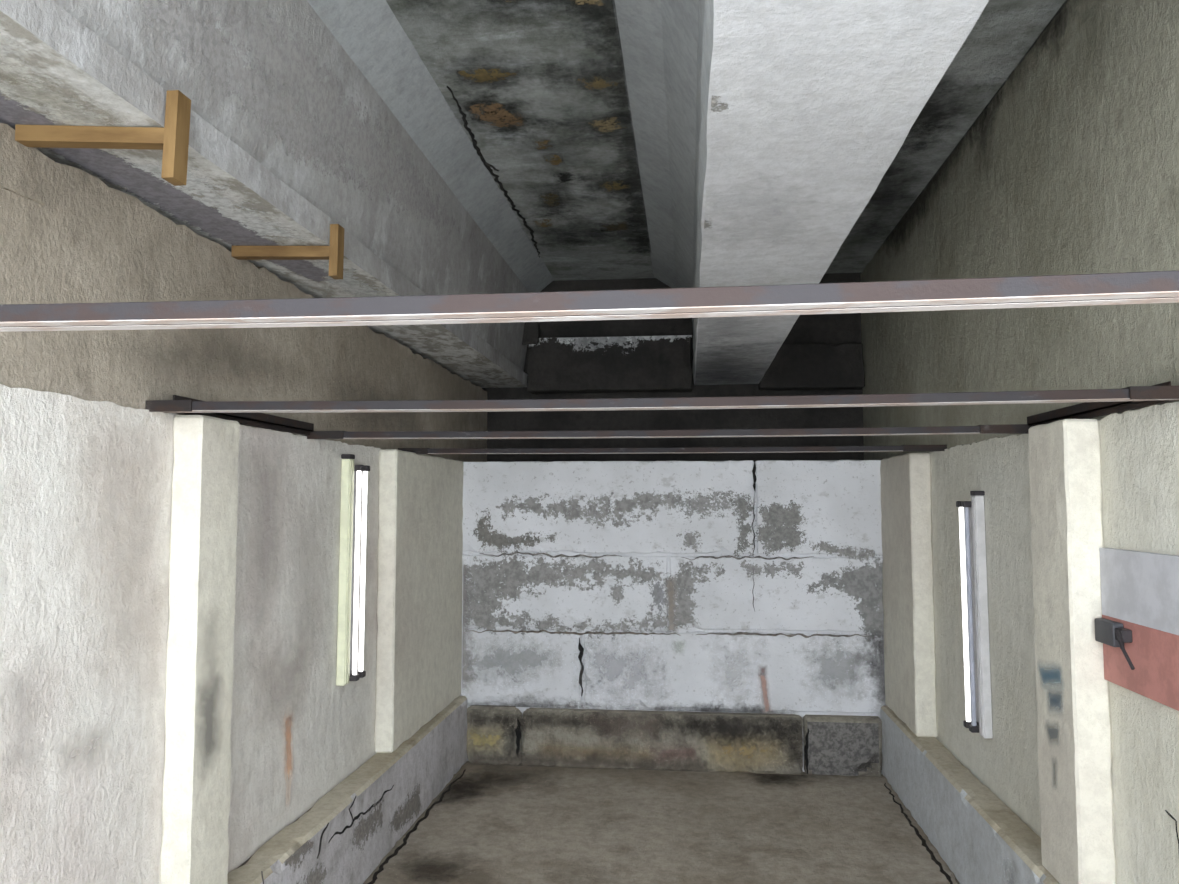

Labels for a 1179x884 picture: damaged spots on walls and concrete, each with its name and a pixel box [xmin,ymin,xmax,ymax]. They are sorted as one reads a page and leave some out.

crack [447,86,540,258]
damp [456,63,547,132]
damp [486,0,651,253]
damp [863,0,1067,249]
crack [470,461,868,697]
peeling [463,488,884,642]
peeling [470,649,545,681]
crack [317,785,394,859]
crack [367,769,466,884]